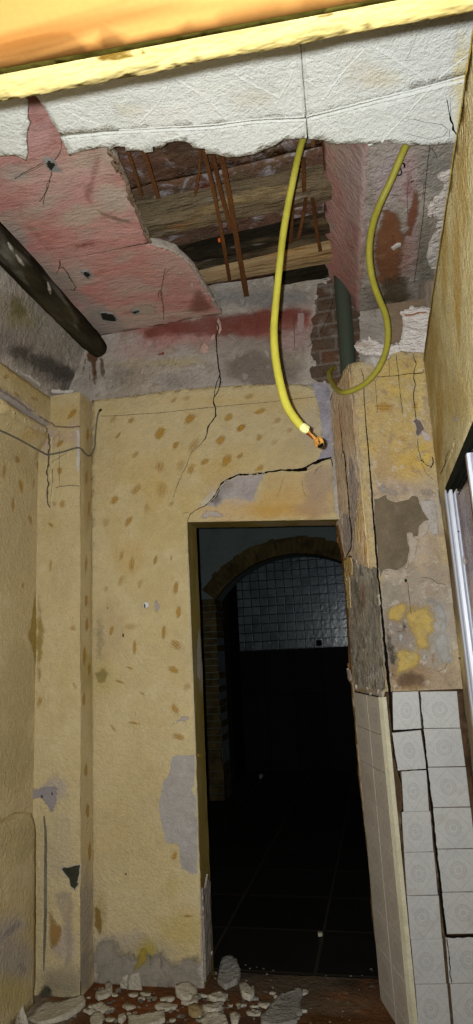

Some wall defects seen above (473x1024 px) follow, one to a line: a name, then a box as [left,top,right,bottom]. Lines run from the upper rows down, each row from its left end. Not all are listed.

crack [15,138,62,206]
leakage [11,347,74,380]
flaking render [106,147,222,354]
peeling [412,28,473,360]
crack [115,320,473,984]
flaking render [335,458,440,697]
leakage [94,908,199,987]
peeling [159,754,217,982]